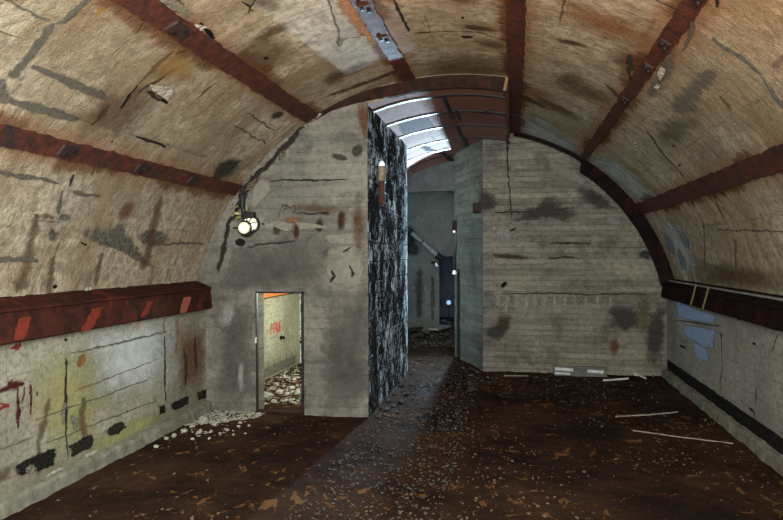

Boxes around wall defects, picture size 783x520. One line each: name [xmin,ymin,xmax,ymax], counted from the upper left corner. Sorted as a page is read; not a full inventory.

crack [393,0,504,40]
crack [0,0,106,121]
crack [712,37,783,108]
damp [16,217,38,290]
damp [81,199,206,285]
crack [217,113,347,271]
crack [495,141,531,217]
damp [515,198,574,221]
damp [579,189,612,208]
crack [505,290,648,298]
damp [609,297,664,353]
peeling [676,301,715,361]